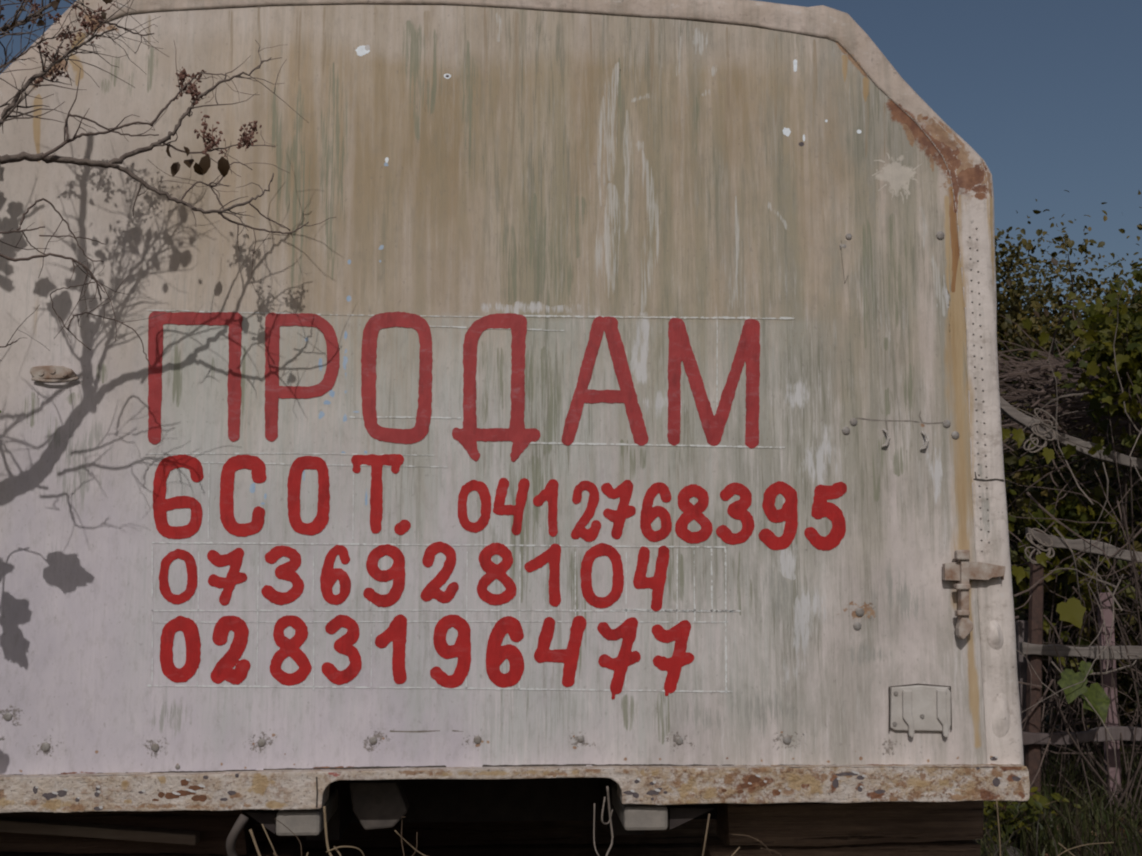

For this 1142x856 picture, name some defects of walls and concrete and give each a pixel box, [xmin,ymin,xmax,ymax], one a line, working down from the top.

leakage [279,6,314,296]
leakage [441,6,693,423]
corrosion [884,96,995,563]
corrosion [387,579,1027,805]
peeling [33,786,80,802]
peeling [138,773,239,802]
peeling [623,778,668,800]
peeling [721,775,781,795]
peeling [832,771,886,794]
peeling [992,775,1022,787]